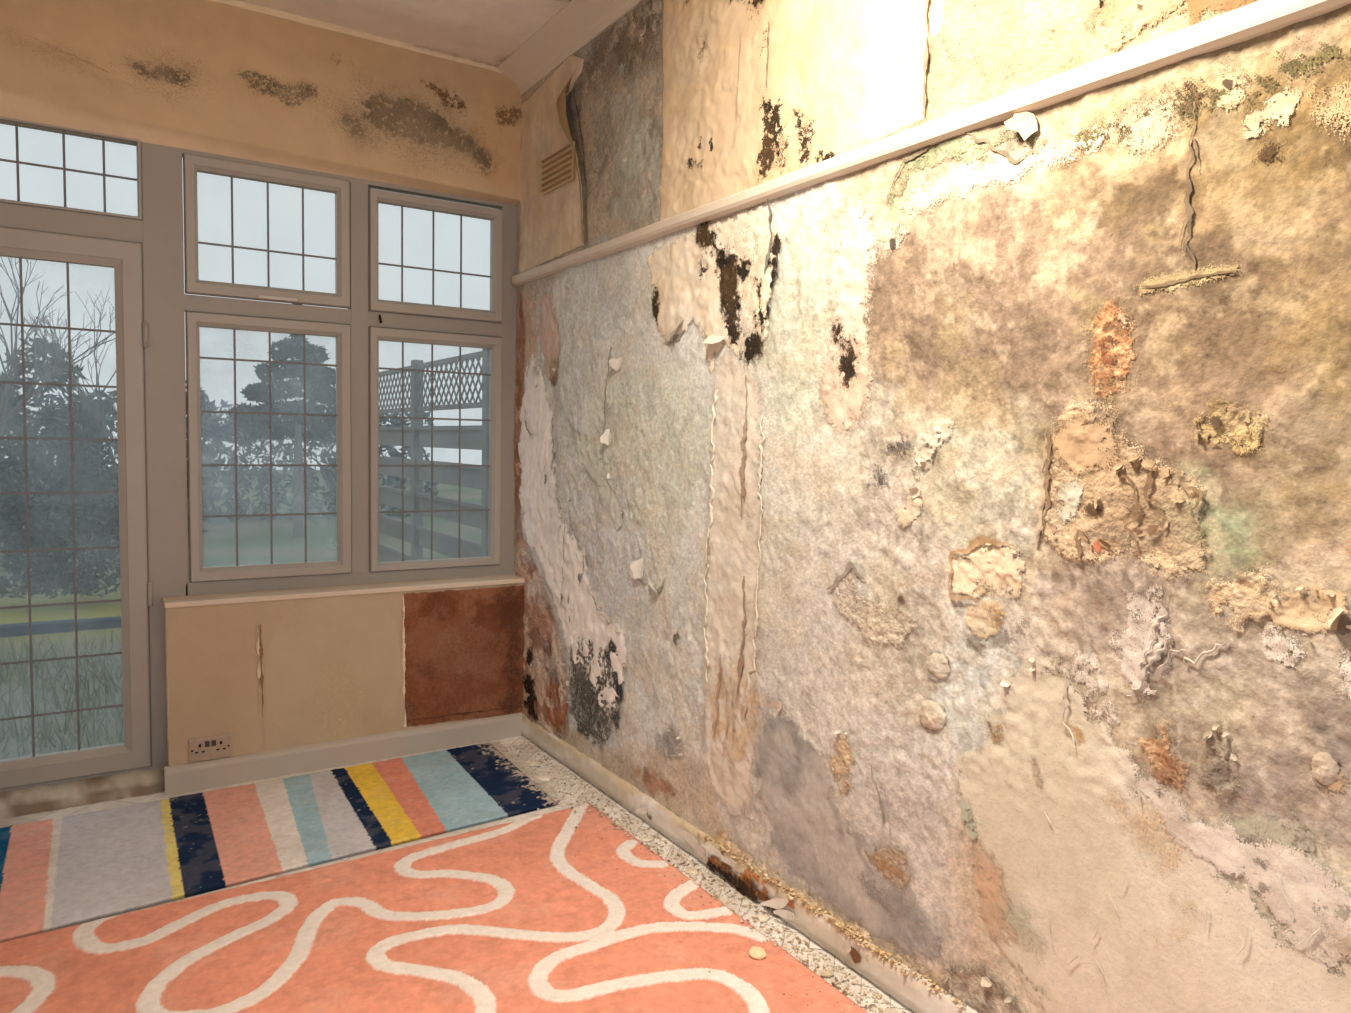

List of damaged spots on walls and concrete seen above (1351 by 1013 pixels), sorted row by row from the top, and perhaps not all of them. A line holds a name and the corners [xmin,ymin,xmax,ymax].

water stain [233,49,522,191]
flaking render [566,0,663,249]
water stain [651,0,835,216]
flaking render [914,0,1260,126]
water stain [1054,11,1351,167]
flaking render [1215,70,1351,143]
flaking render [818,71,1190,438]
rust [1066,285,1165,421]
peeling [396,291,628,737]
crack [256,624,265,749]
water stain [568,637,626,751]
flaking render [693,396,1351,1013]